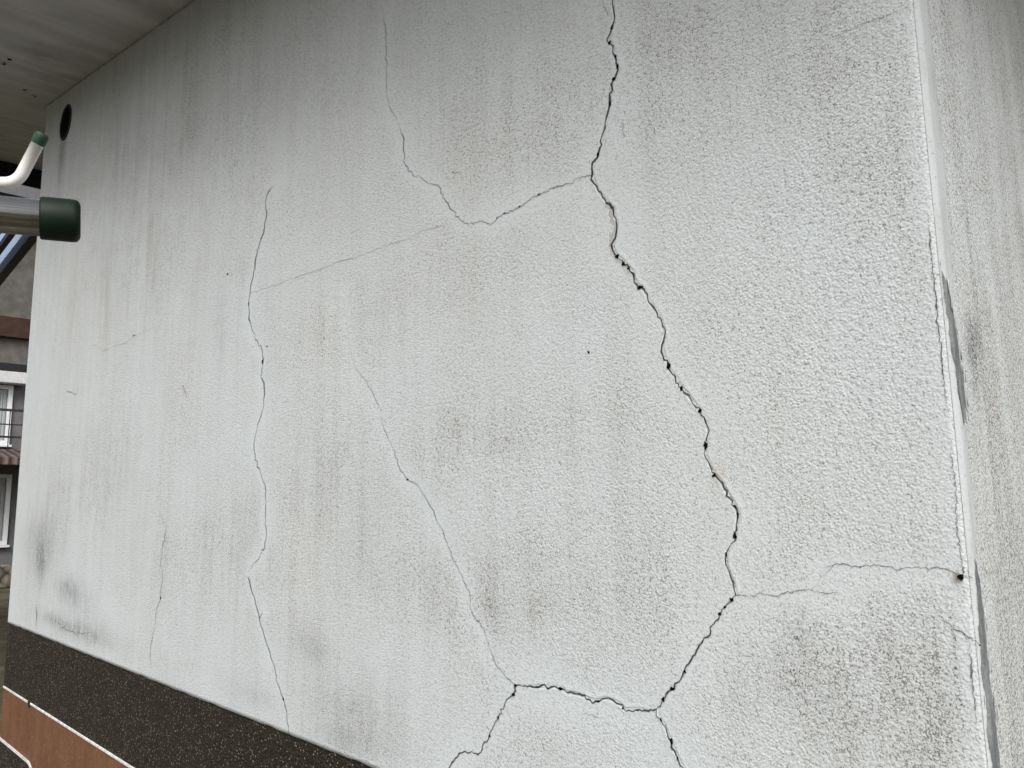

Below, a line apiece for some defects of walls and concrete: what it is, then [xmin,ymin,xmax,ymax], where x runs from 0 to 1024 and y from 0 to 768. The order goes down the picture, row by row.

crack [402,0,830,768]
crack [827,459,973,578]
crack [943,620,981,646]